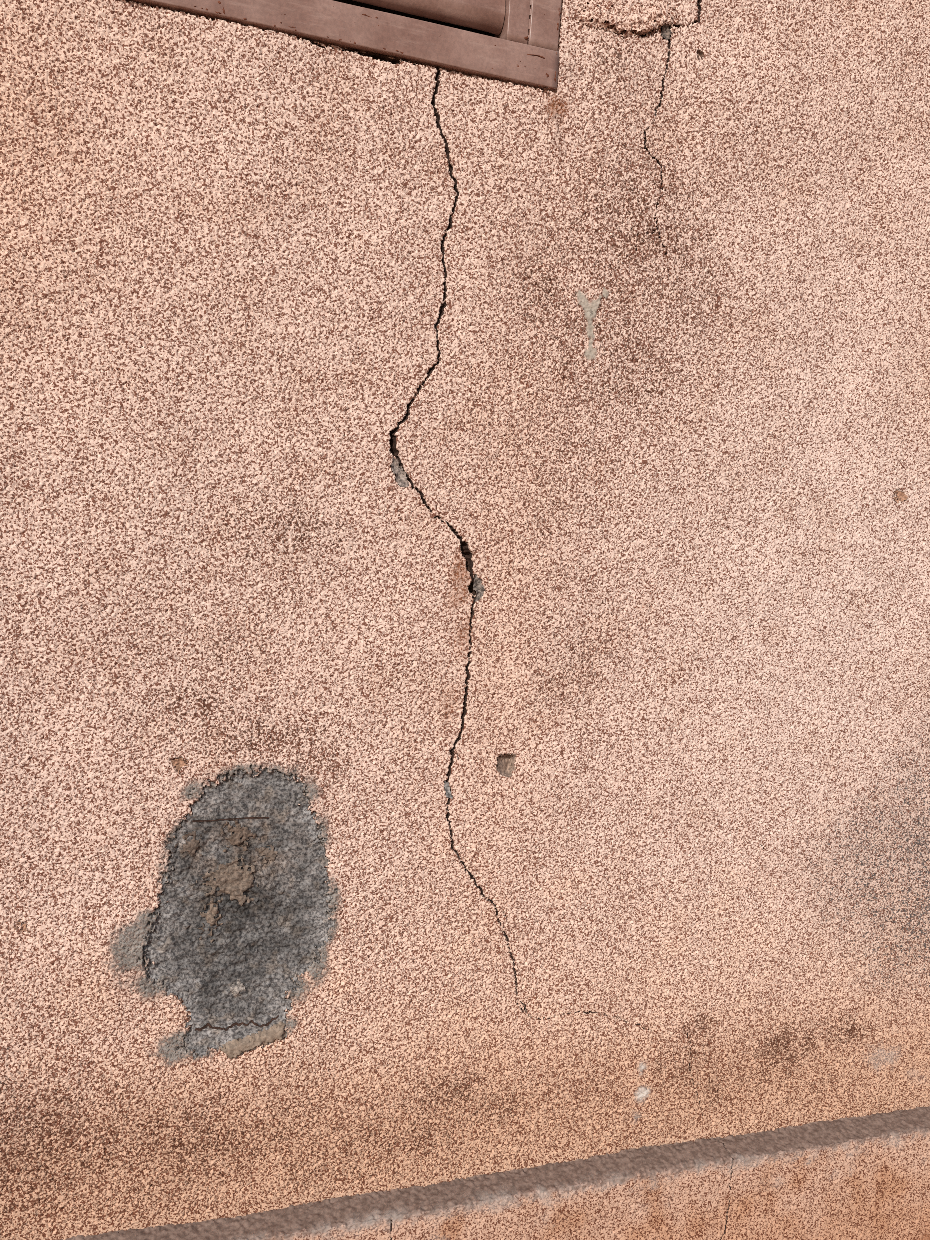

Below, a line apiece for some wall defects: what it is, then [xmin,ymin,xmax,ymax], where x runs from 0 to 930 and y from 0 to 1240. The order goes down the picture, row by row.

crack [606,0,702,255]
crack [389,66,649,1030]
spalling [110,764,340,1065]